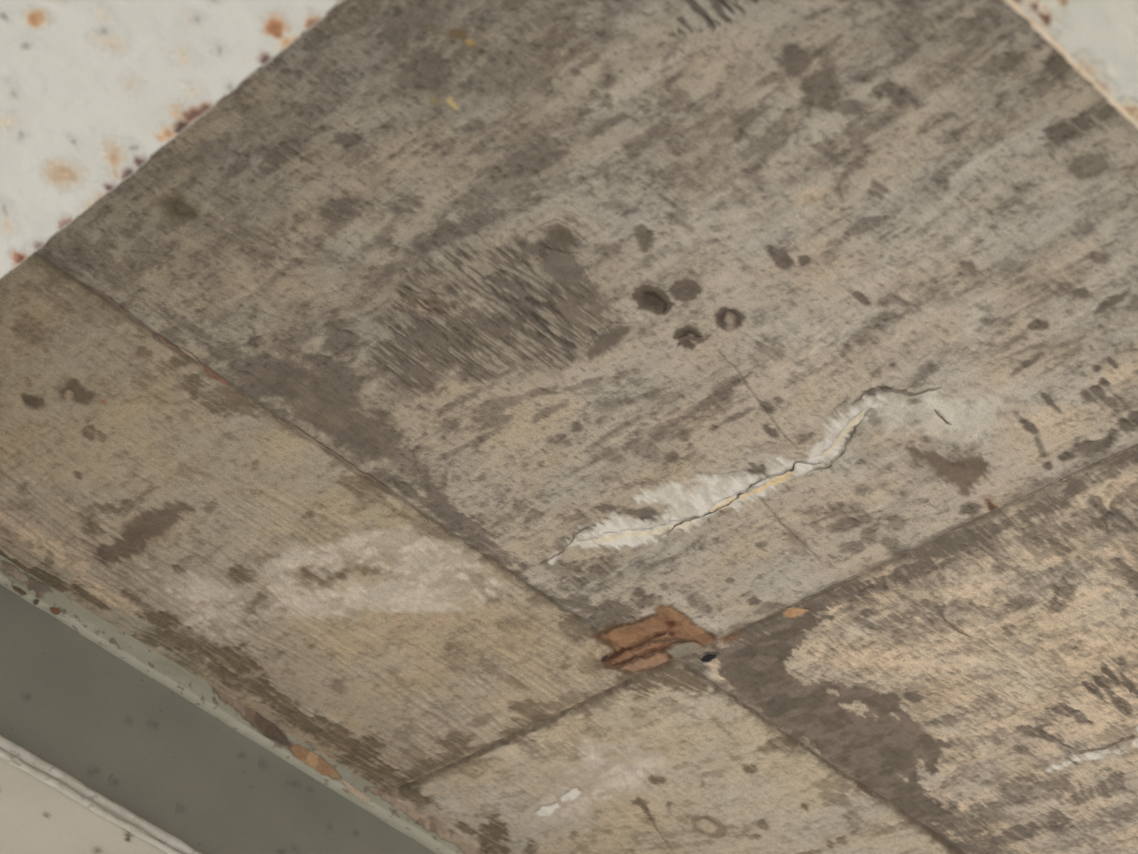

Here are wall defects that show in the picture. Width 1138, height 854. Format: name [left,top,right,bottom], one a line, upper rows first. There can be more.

rust [18,0,81,32]
rust [252,0,344,66]
rust [149,97,216,145]
rust [5,132,150,270]
crack [539,350,1021,567]
peeling [586,602,961,829]
crack [1043,668,1138,775]